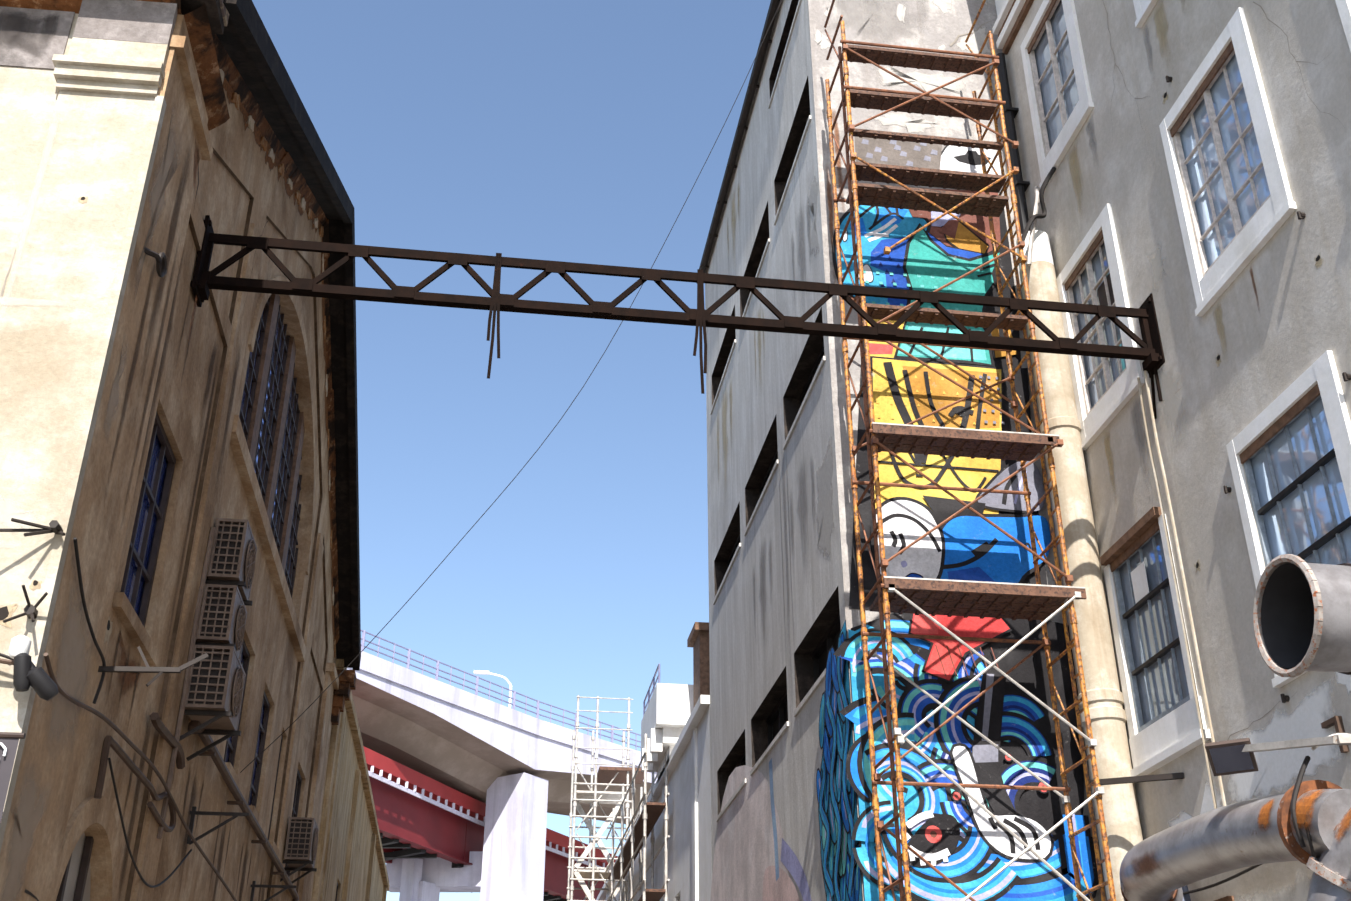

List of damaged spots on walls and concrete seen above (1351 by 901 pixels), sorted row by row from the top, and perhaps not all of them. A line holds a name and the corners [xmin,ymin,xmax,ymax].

peeling [897,4,906,23]
peeling [938,0,991,54]
water stain [187,350,216,530]
water stain [223,368,237,446]